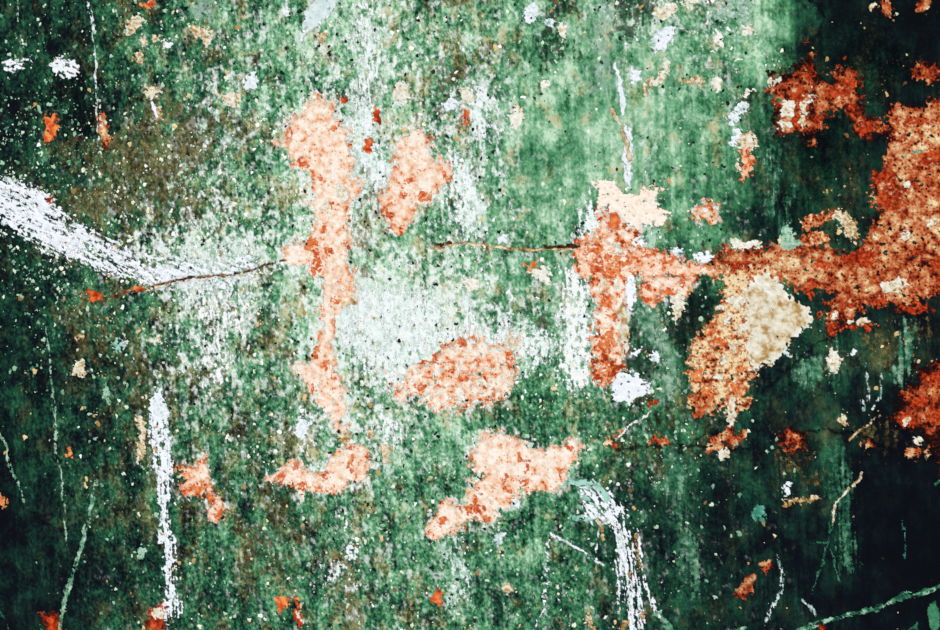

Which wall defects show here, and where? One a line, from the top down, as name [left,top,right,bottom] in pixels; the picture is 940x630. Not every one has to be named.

corrosion [868,0,894,18]
corrosion [915,0,931,12]
crack [430,237,581,253]
corrosion [570,34,940,476]
crack [100,259,287,300]
peeling [254,388,475,517]